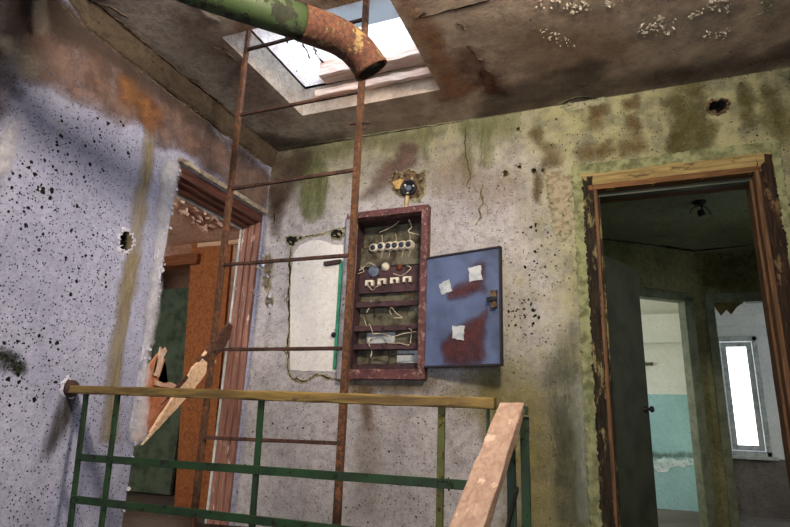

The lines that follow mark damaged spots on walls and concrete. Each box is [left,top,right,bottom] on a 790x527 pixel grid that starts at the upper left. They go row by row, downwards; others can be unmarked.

crack [415,0,498,82]
spalling [43,115,79,174]
leakage [530,129,559,167]
leakage [579,96,644,158]
leakage [665,84,716,153]
spalling [705,97,731,116]
leakage [738,84,790,138]
spalling [116,227,136,256]
leakage [0,0,281,443]
spalling [129,161,223,432]
leakage [46,397,72,453]